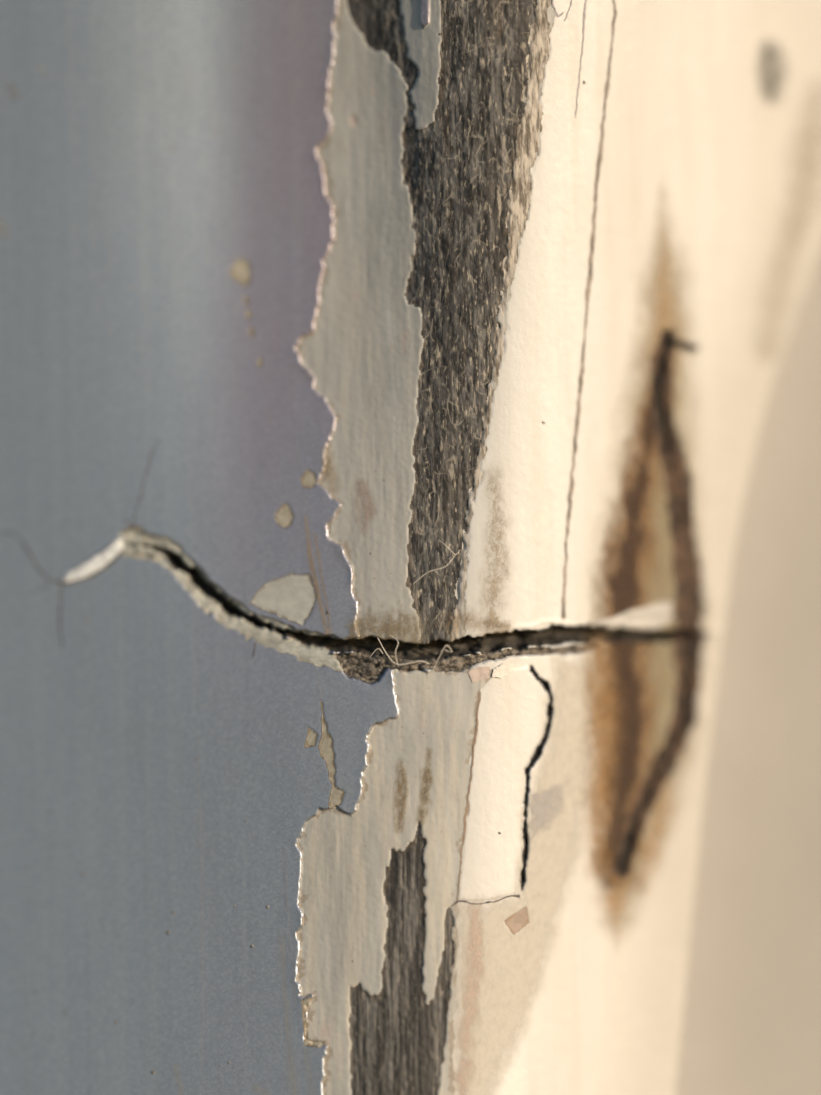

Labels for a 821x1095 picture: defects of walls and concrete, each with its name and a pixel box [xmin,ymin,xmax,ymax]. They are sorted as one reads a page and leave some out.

crack [0,0,706,907]
peeling [296,0,442,645]
peeling [296,668,494,1095]
peeling [446,0,556,644]
peeling [505,906,529,935]
corrosion [595,372,678,909]
corrosion [649,261,688,469]